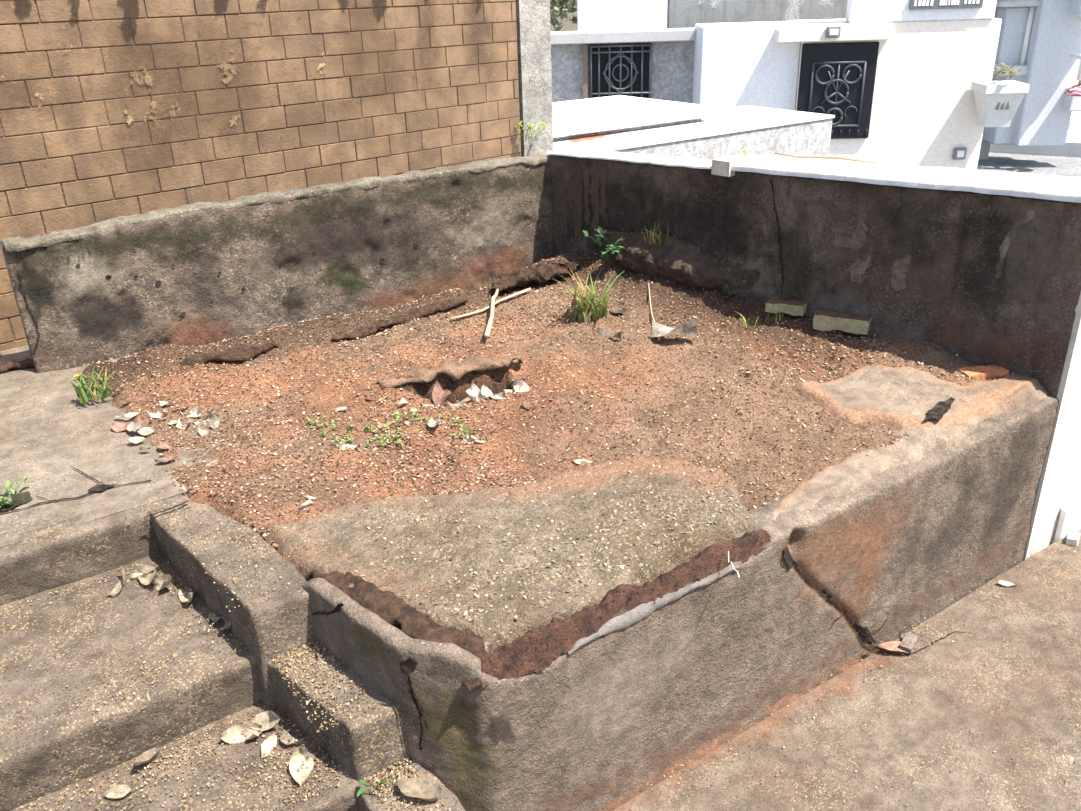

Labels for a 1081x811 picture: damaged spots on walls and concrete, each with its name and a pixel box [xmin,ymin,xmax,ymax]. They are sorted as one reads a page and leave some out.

water stain [275,209,422,270]
water stain [968,210,1035,298]
water stain [19,259,55,319]
water stain [70,296,147,340]
water stain [284,287,304,308]
spalling [925,397,955,420]
crack [0,465,151,514]
spalling [462,529,770,708]
crack [784,546,887,650]
crack [399,658,433,751]